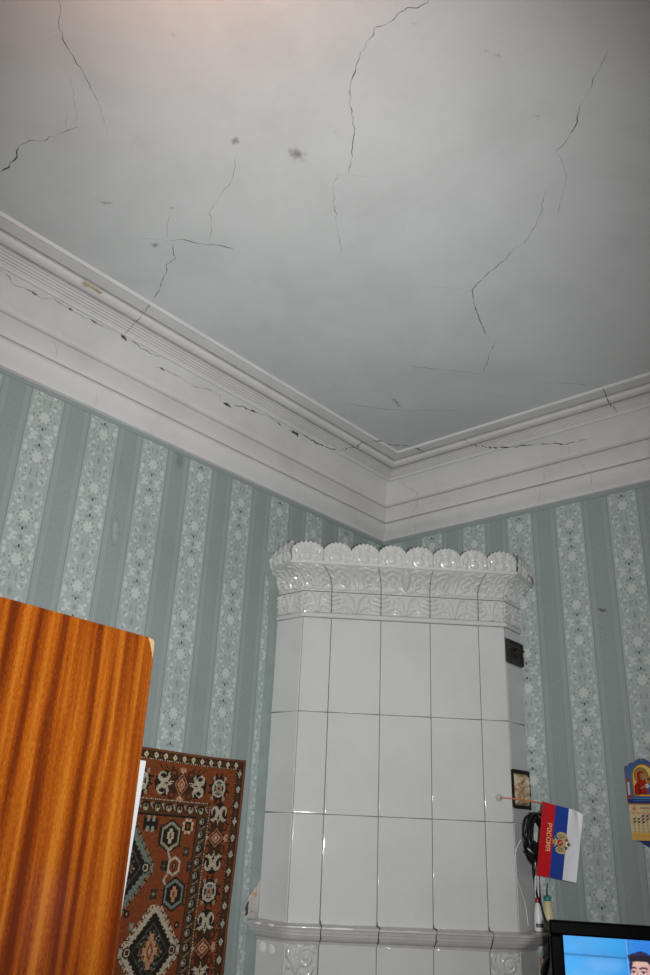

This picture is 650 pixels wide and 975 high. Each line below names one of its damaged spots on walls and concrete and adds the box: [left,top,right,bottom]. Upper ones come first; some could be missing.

crack [2,0,107,171]
crack [7,169,424,452]
crack [333,0,429,250]
crack [419,56,606,374]